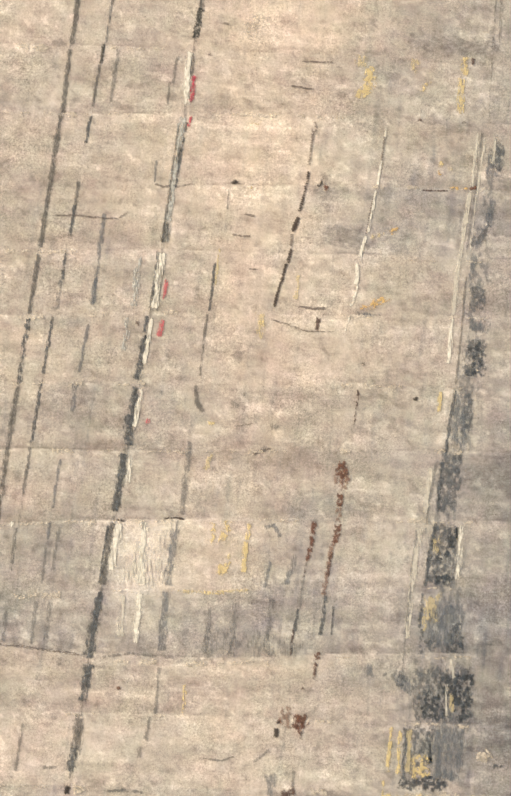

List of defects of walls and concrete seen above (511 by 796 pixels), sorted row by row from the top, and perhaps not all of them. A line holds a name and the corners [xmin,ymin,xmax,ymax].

corrosion [304,522,317,577]
corrosion [321,461,349,595]
corrosion [273,707,309,738]